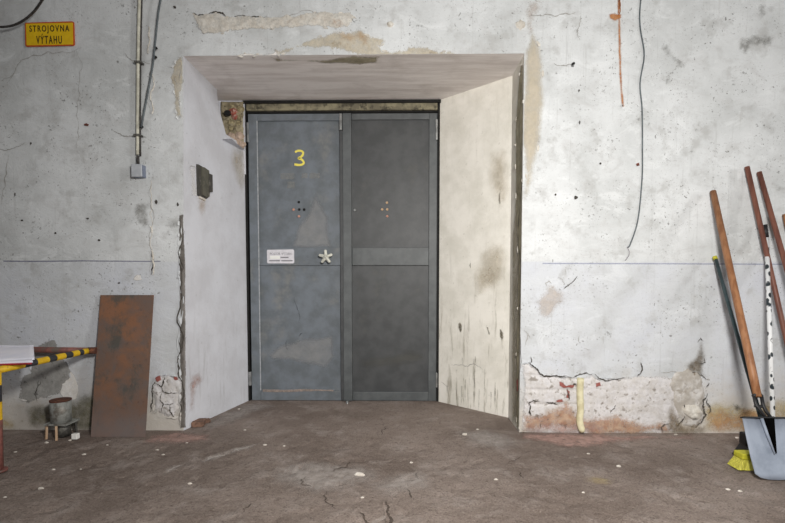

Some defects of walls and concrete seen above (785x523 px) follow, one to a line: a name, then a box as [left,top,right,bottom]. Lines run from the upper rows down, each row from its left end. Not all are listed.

spalling [193,10,451,64]
crack [148,180,156,275]
spalling [150,202,211,428]
crack [176,215,185,428]
flaking render [515,41,679,434]